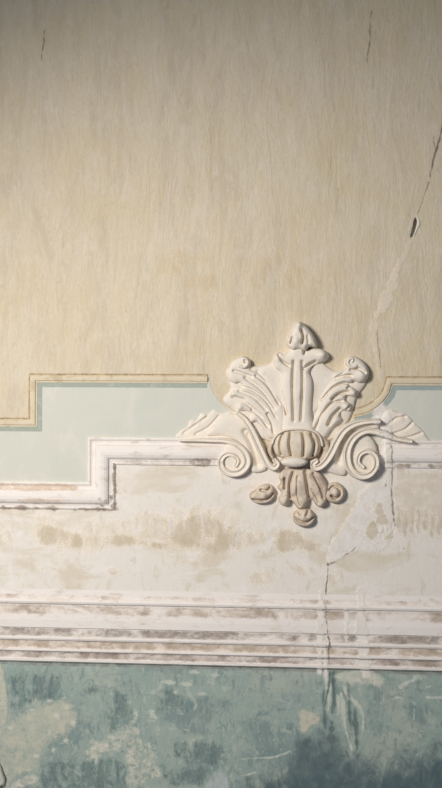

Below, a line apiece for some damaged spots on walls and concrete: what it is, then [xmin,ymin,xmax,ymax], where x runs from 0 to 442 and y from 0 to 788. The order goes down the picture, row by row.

crack [417,125,442,213]
crack [324,548,355,706]